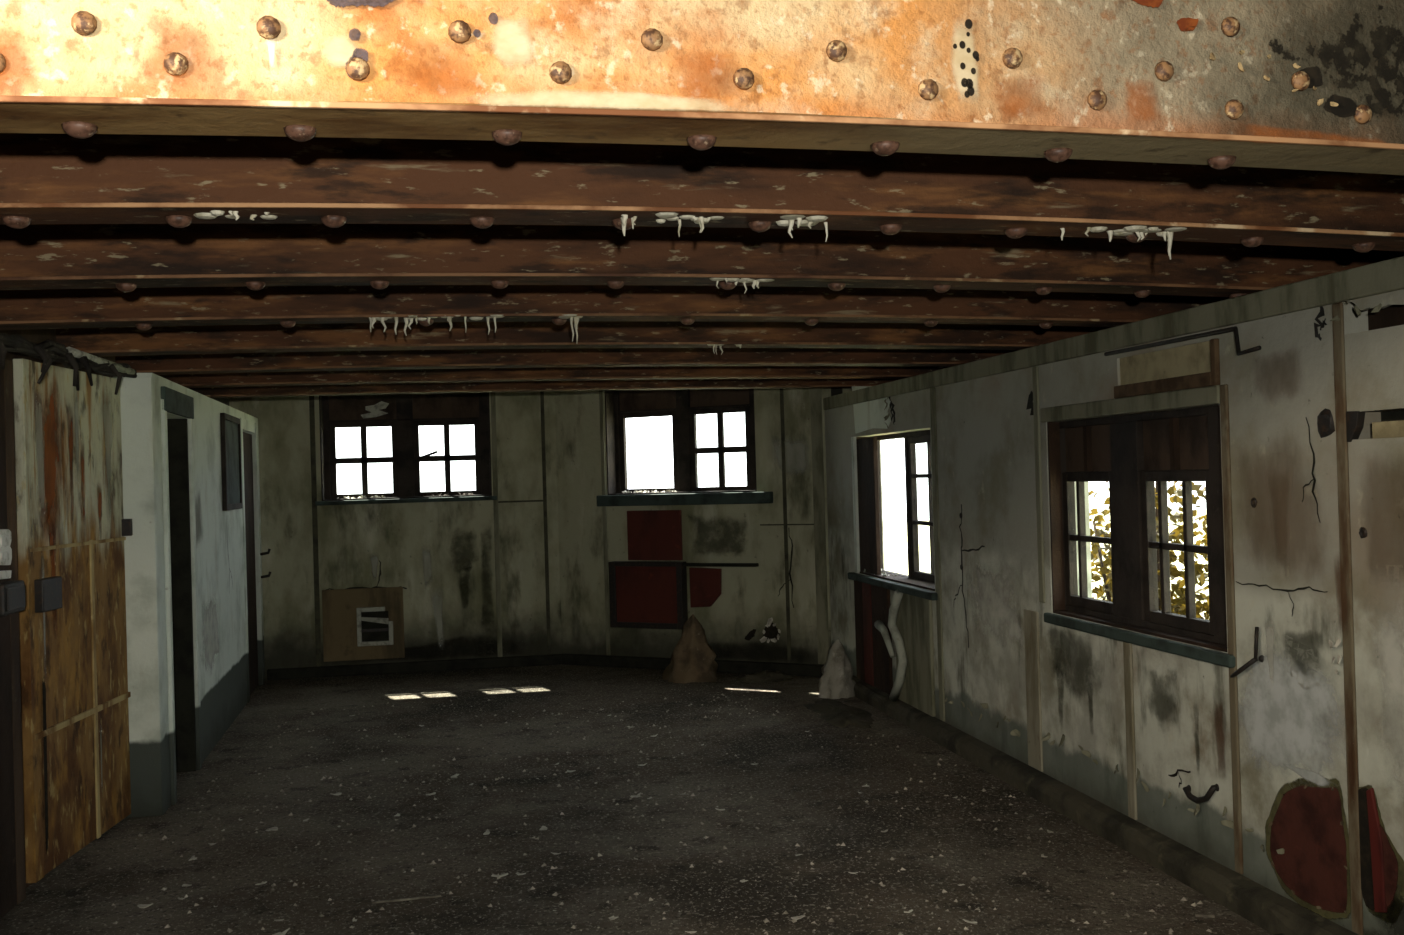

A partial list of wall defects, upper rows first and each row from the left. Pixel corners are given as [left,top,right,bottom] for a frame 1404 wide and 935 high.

rust [1133,0,1163,8]
rust [1177,17,1199,31]
damp [620,214,637,236]
damp [655,212,724,237]
damp [776,214,828,242]
efflorescence [1085,225,1187,260]
damp [369,315,505,336]
damp [559,314,583,344]
damp [1154,680,1174,718]
spalling [1221,778,1404,924]